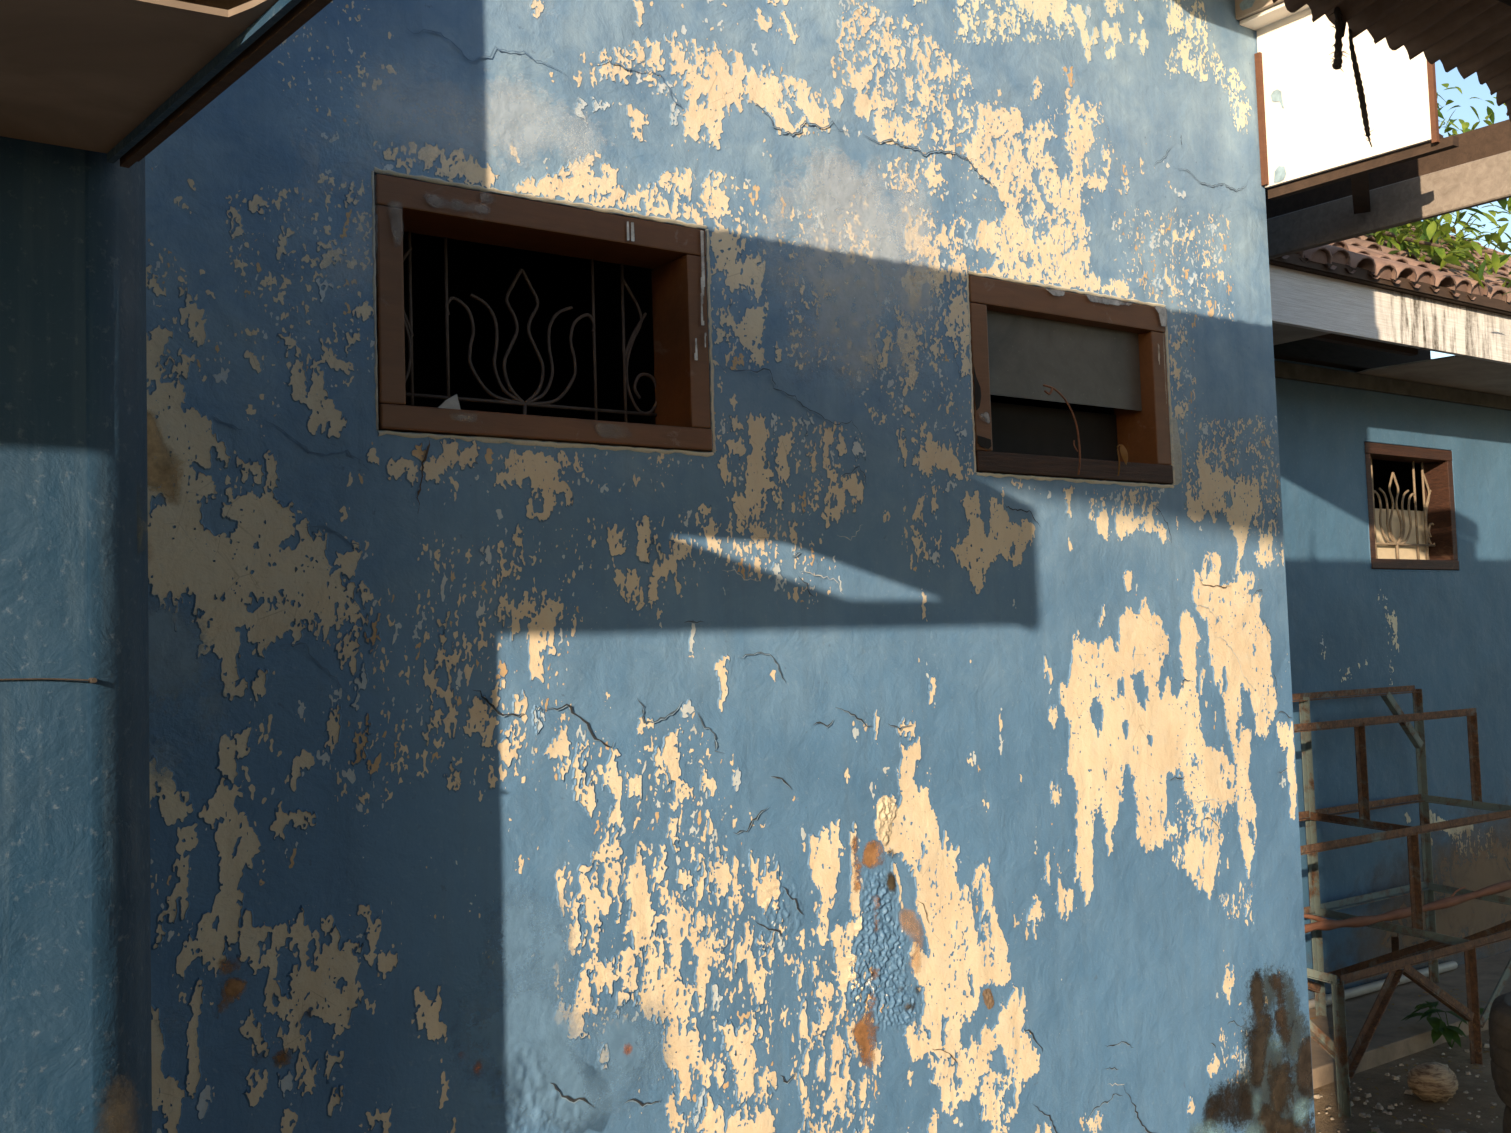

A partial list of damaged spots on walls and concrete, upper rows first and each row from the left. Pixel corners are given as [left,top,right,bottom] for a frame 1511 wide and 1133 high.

crack [602,59,683,108]
water stain [147,412,178,499]
peeling [146,0,1298,1133]
rust [852,836,882,890]
rust [852,996,878,1066]
crack [1034,1041,1152,1133]
water stain [1201,971,1315,1133]